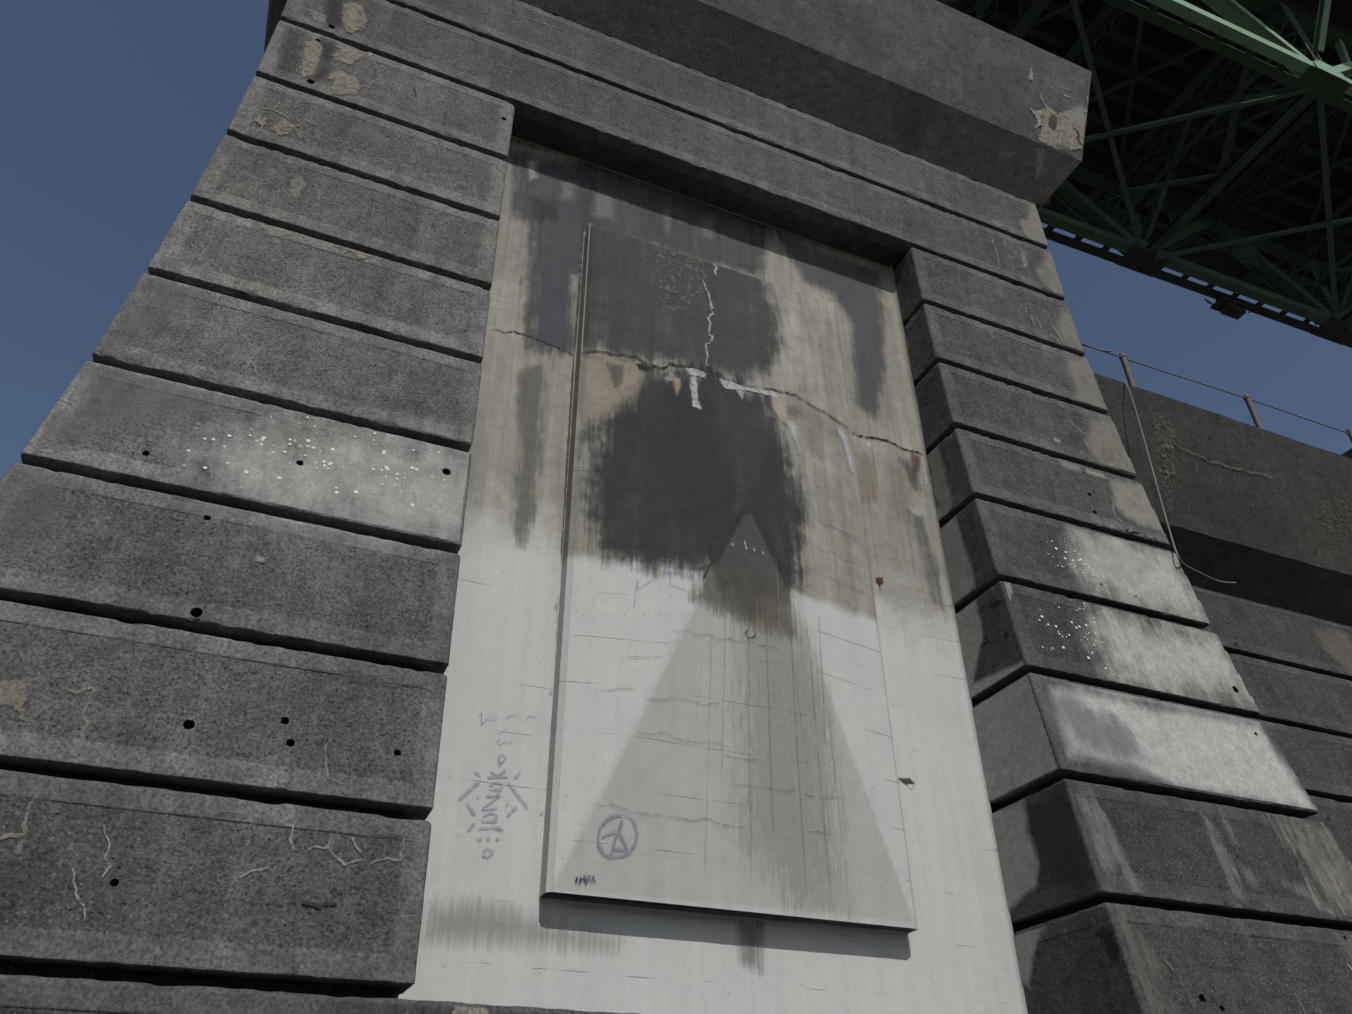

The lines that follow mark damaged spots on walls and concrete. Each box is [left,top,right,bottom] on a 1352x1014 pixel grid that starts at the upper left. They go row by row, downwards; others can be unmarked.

peeling [342,2,368,33]
peeling [299,41,385,95]
spalling [1030,95,1089,151]
water stain [512,154,805,636]
crack [496,222,922,635]
water stain [838,429,871,472]
crack [608,656,839,799]